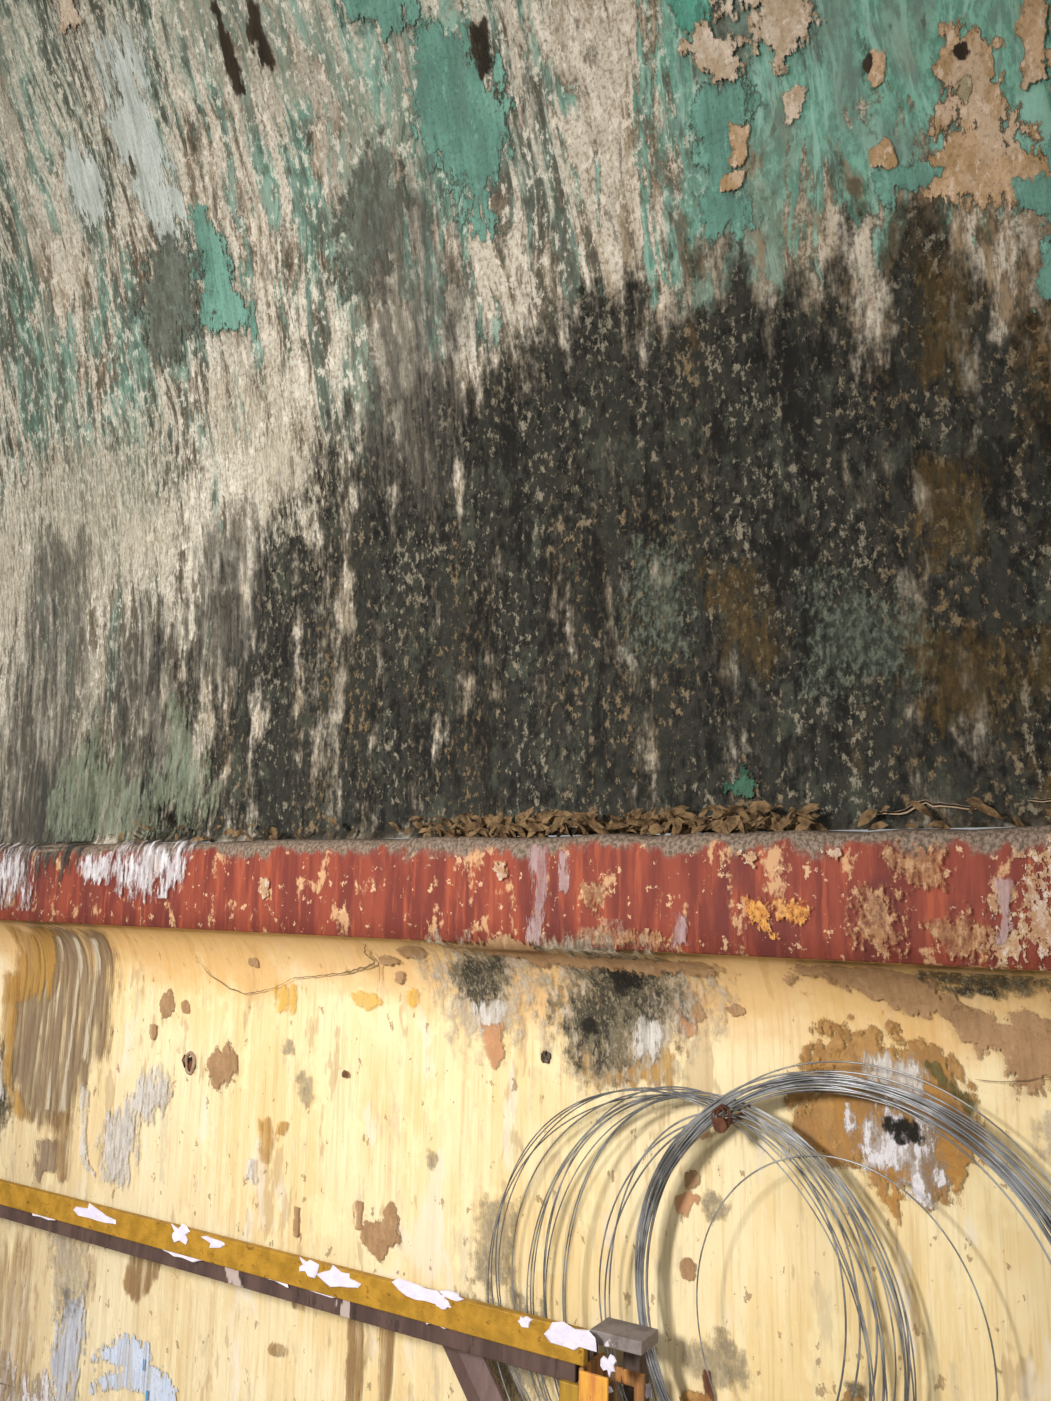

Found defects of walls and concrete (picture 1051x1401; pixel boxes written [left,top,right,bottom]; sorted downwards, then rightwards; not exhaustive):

peeling [665,0,825,243]
peeling [862,49,887,88]
peeling [867,0,1051,313]
water stain [0,161,1051,1183]
peeling [43,687,223,842]
peeling [444,881,721,1038]
spalling [735,850,759,868]
spalling [742,895,813,940]
peeling [782,830,1051,1226]